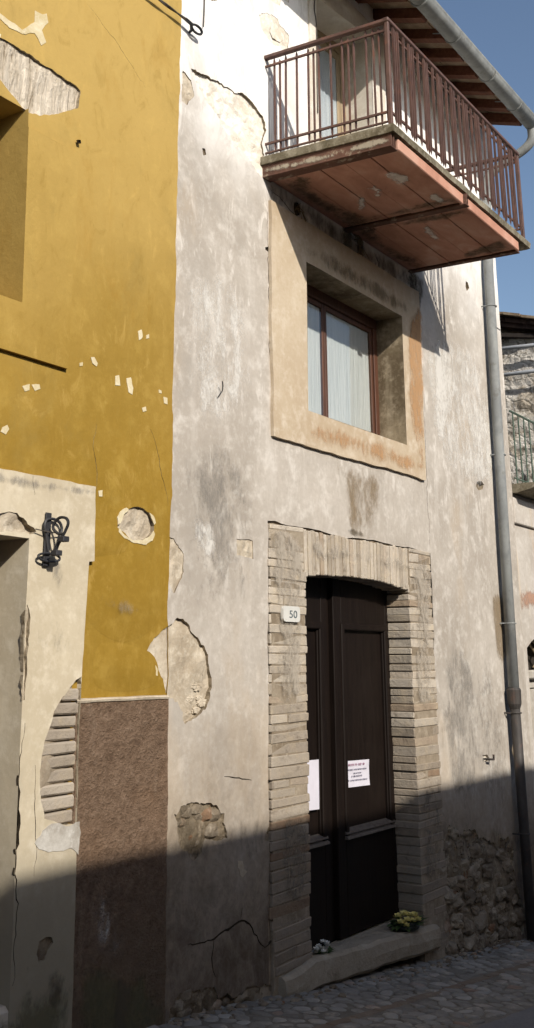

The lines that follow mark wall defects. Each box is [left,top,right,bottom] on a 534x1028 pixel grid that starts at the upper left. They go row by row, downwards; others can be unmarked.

flaking render [259,0,289,50]
flaking render [0,11,80,116]
flaking render [182,69,266,177]
peeling [115,375,133,394]
flaking render [0,512,36,534]
flaking render [117,507,156,545]
flaking render [169,537,184,593]
flaking render [147,618,212,724]
flaking render [40,677,81,825]
flaking render [174,802,227,861]
crack [188,912,272,977]